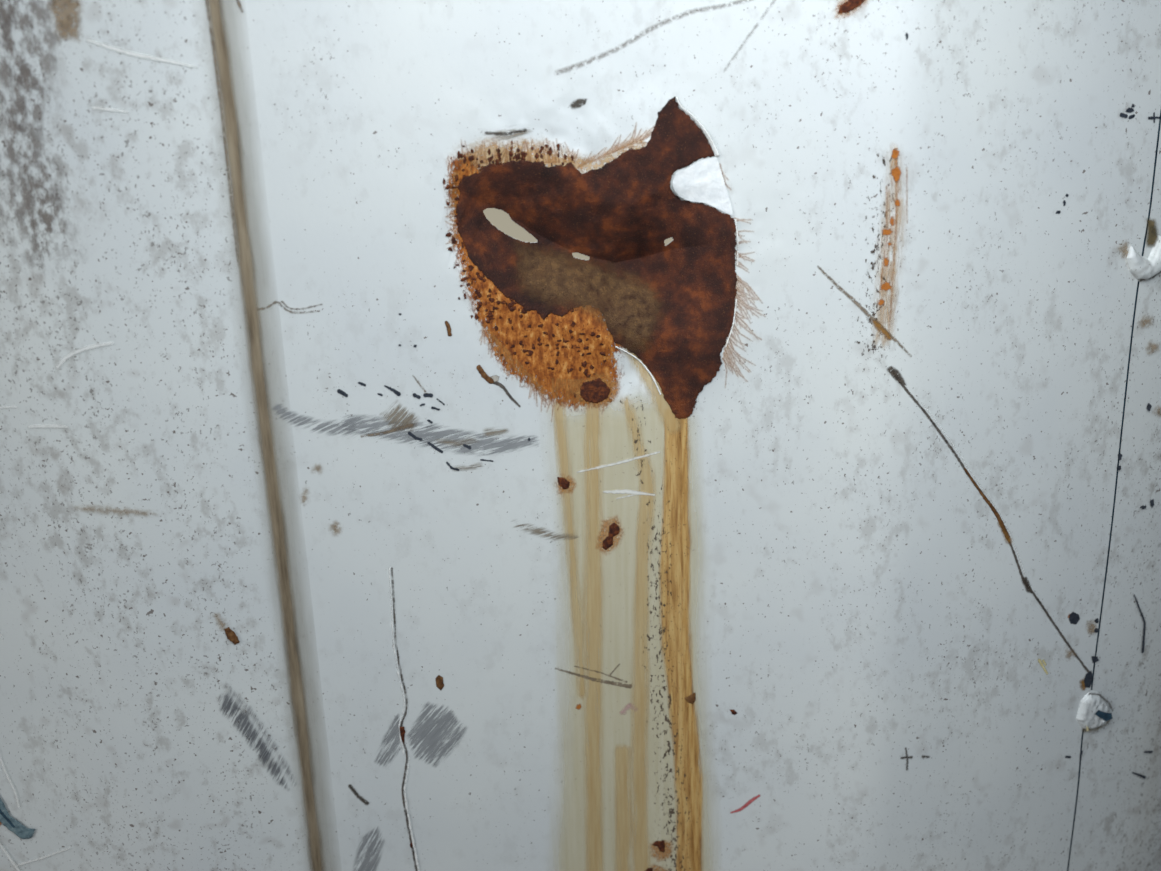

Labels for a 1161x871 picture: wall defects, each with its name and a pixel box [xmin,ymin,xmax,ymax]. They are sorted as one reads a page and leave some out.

corrosion [838,0,866,15]
corrosion [857,149,901,370]
corrosion [443,141,706,871]
crack [389,568,419,871]